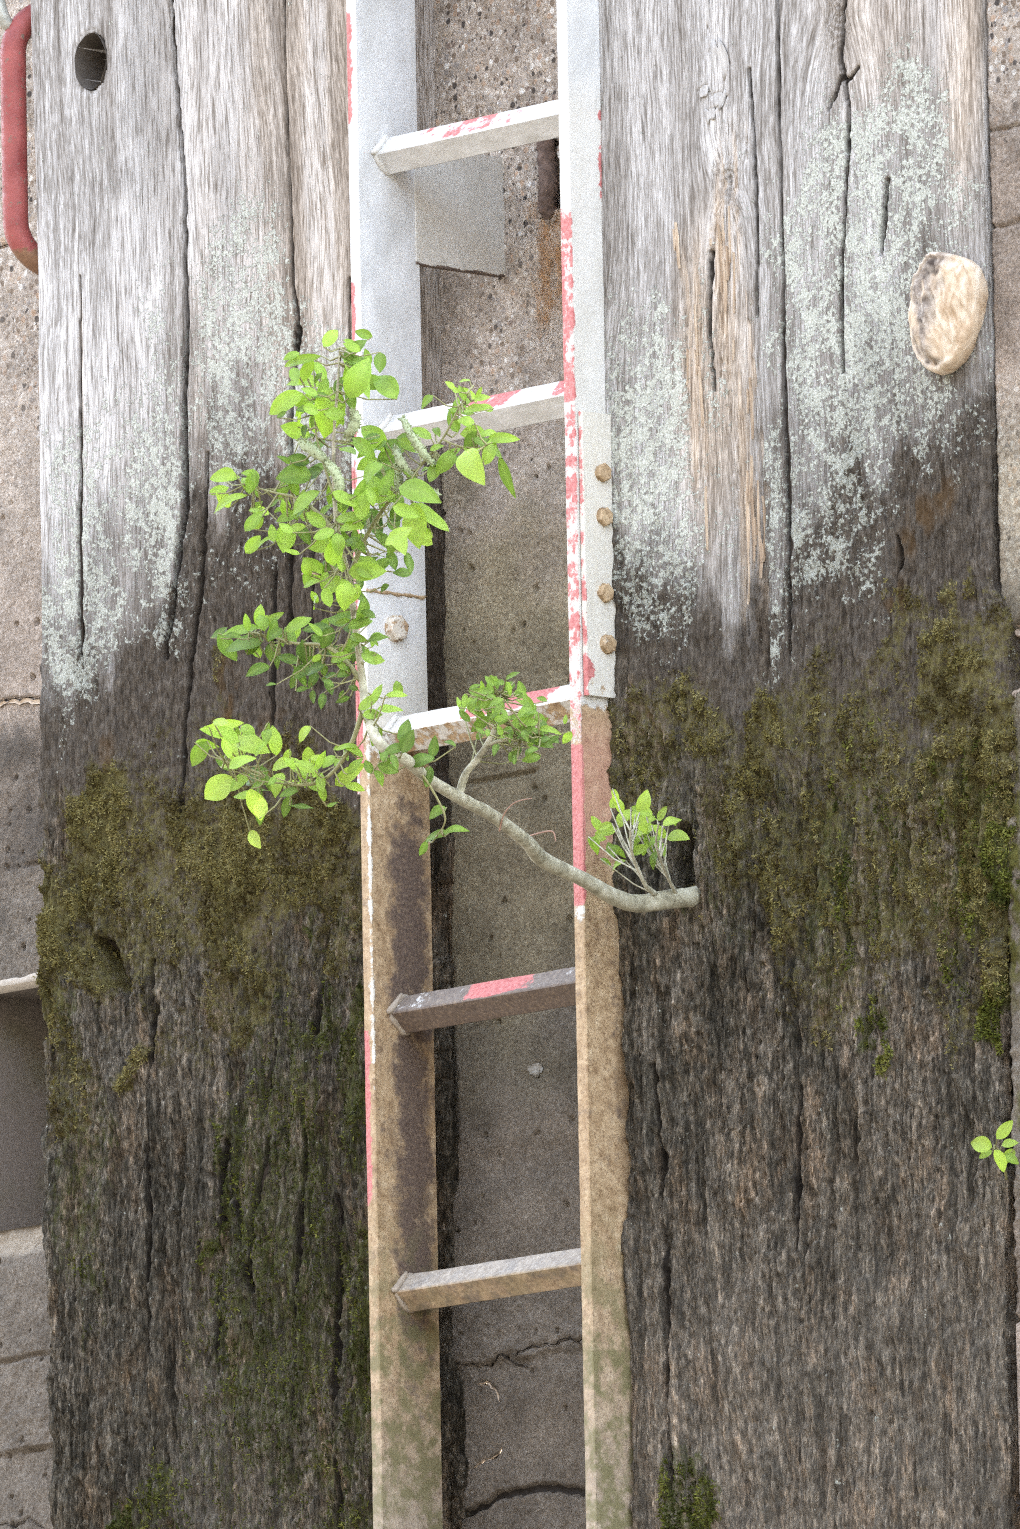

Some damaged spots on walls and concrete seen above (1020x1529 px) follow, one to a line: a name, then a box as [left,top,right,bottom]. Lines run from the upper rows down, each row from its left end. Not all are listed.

crack [0,697,40,706]
crack [457,1337,582,1402]